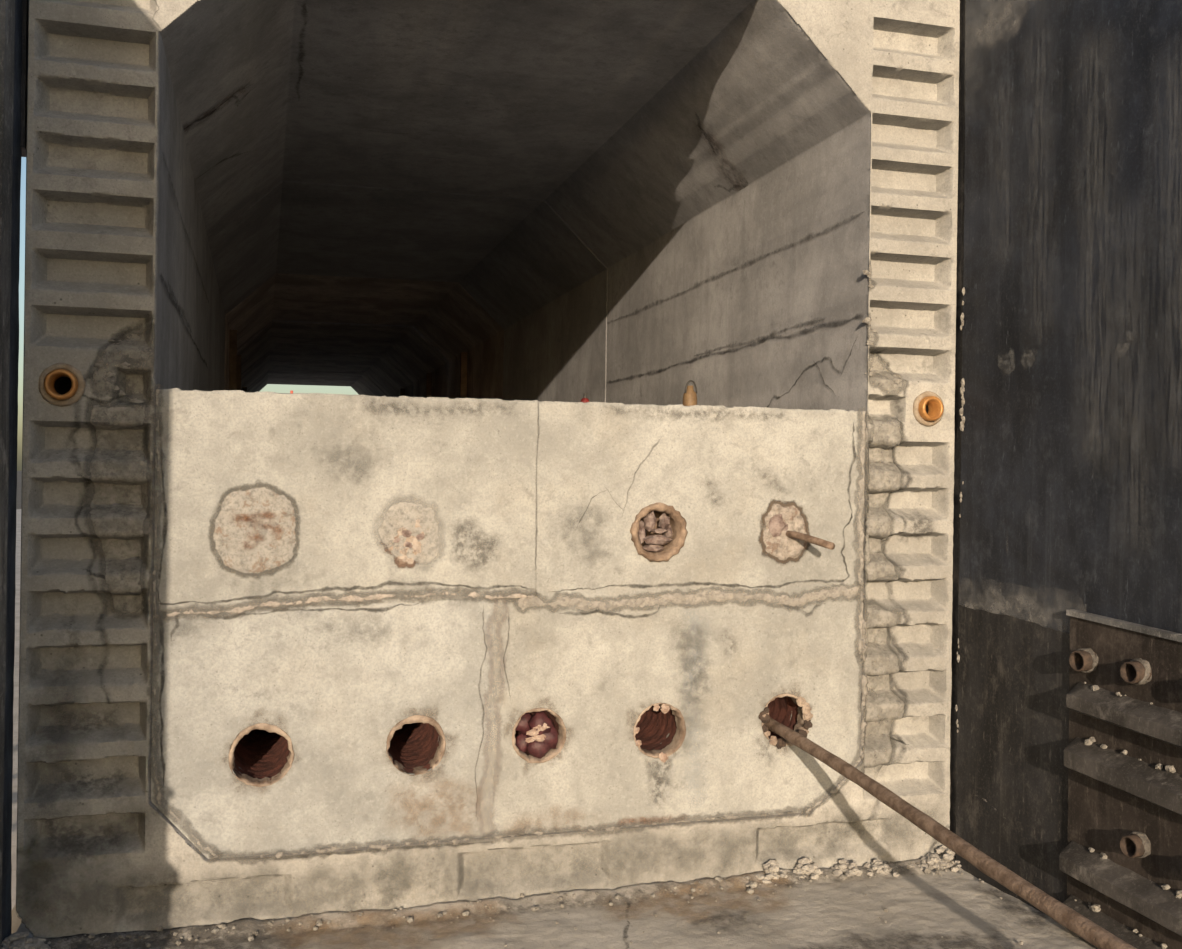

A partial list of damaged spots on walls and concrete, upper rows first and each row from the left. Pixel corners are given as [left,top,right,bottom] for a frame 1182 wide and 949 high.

crack [85,320,147,403]
crack [609,315,860,408]
spalling [862,316,903,393]
crack [75,463,105,632]
spalling [381,519,425,568]
crack [554,424,856,618]
crack [146,428,190,792]
crack [217,581,525,619]